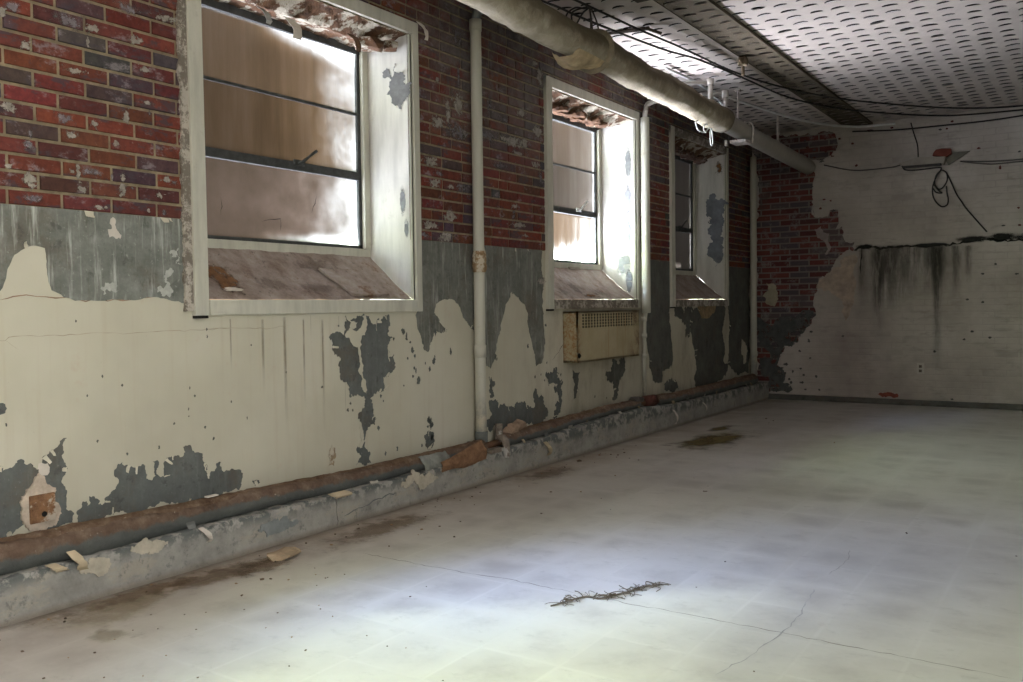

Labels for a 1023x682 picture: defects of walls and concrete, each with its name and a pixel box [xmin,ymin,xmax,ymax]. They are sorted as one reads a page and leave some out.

peeling [347,33,412,109]
peeling [771,131,854,162]
peeling [0,204,185,303]
peeling [646,147,854,393]
damp [914,243,946,262]
damp [957,233,1023,242]
peeling [329,240,580,466]
peeling [0,438,260,538]
damp [685,433,740,446]
crack [369,550,1014,679]